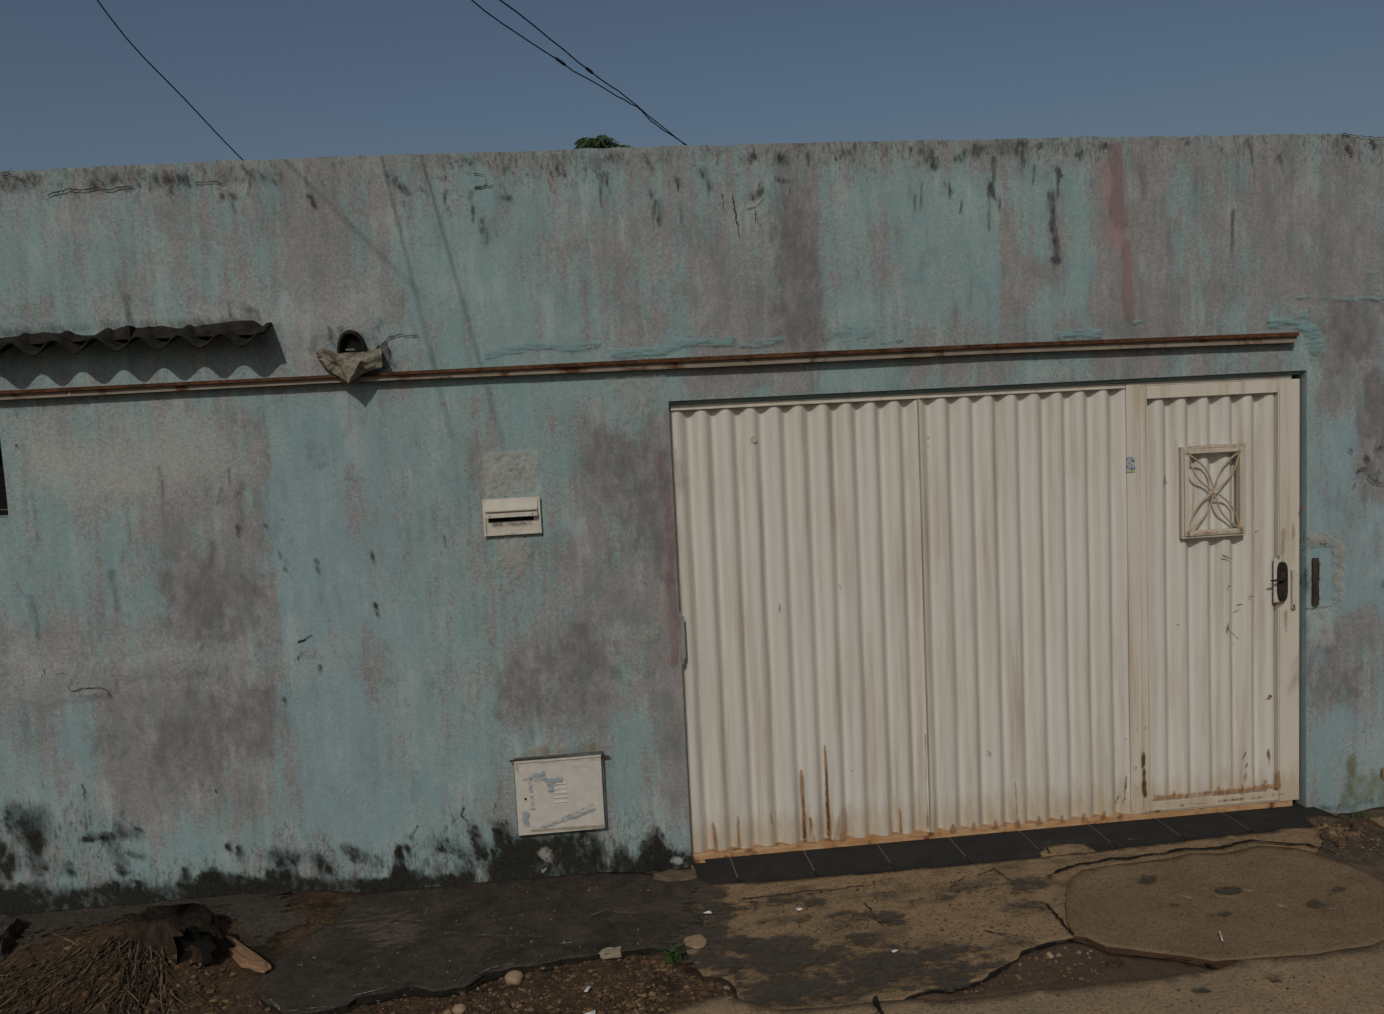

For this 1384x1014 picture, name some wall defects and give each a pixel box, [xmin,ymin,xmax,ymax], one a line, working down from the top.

rust [799,745,846,840]
rust [1117,749,1281,812]
leakage [0,805,699,952]
crack [873,839,1344,1014]